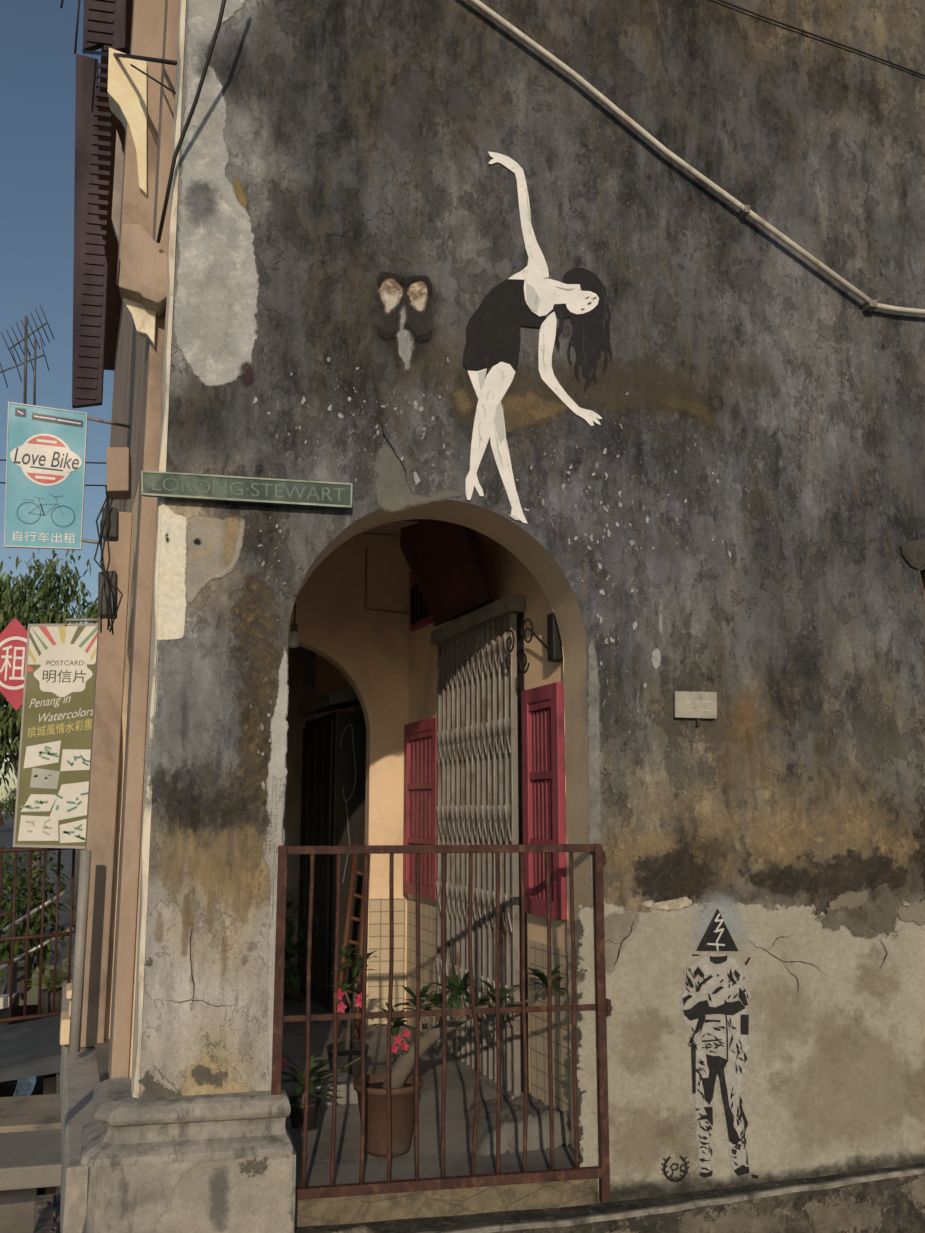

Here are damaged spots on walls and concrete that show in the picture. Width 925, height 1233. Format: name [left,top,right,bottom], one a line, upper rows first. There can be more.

flaking render [173,0,259,386]
flaking render [184,514,244,603]
damp [146,771,278,988]
damp [615,809,925,909]
crack [164,929,234,1009]
flaking render [604,897,692,976]
crack [750,935,824,1001]
flaking render [812,882,925,969]
crack [334,1225,367,1233]